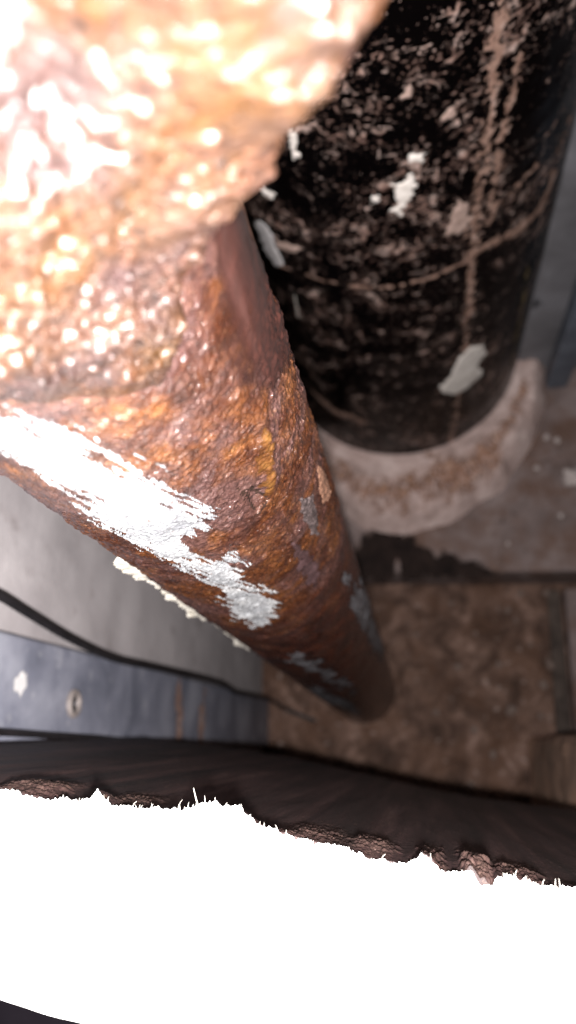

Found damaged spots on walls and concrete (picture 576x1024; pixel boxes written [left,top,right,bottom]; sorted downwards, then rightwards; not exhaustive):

spalling [440,107,457,125]
spalling [287,131,301,160]
spalling [389,153,426,217]
spalling [445,200,473,236]
spalling [255,221,303,267]
rust [216,206,291,388]
spalling [439,344,487,395]
rust [256,428,277,496]
peeling [0,404,282,651]
rust [291,542,320,588]